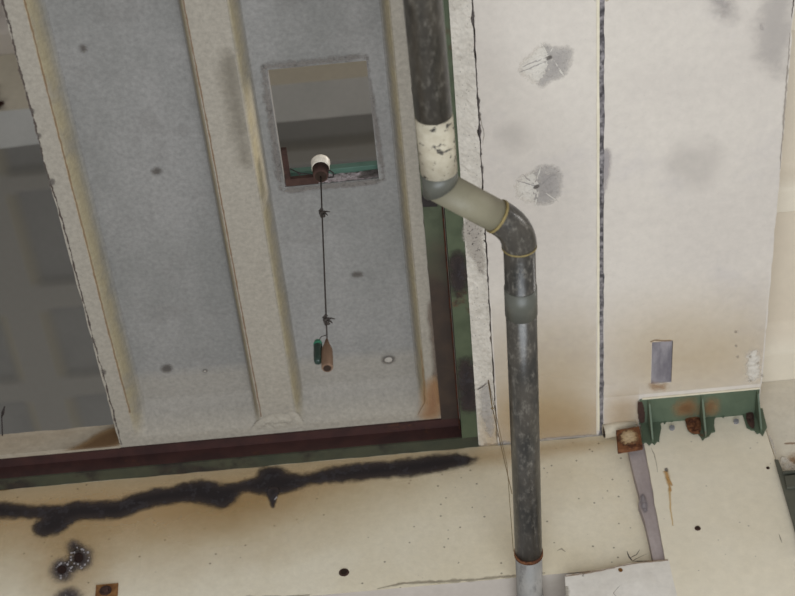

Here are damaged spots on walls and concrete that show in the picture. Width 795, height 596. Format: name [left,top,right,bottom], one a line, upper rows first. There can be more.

crack [471,0,483,184]
corrosion [616,426,643,454]